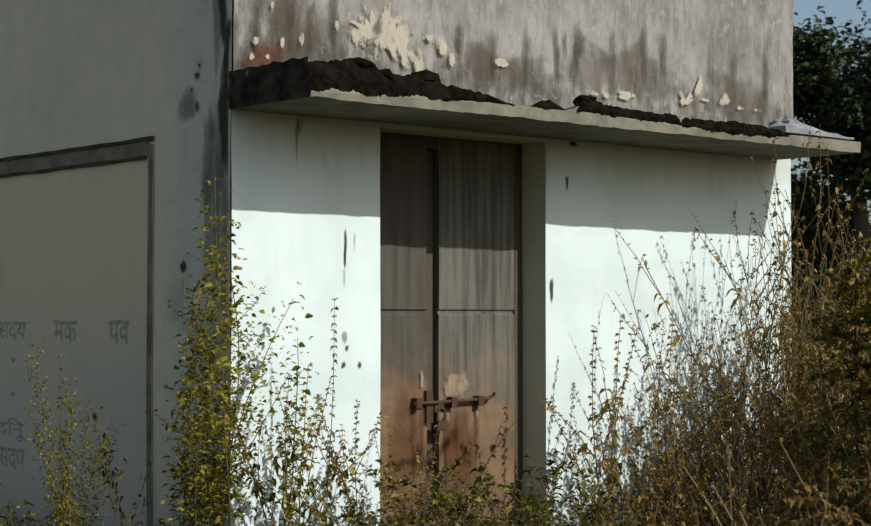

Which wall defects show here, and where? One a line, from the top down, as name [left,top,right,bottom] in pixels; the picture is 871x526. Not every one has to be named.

spalling [228,3,515,109]
water stain [206,0,231,190]
spalling [532,91,790,138]
peeling [680,75,709,106]
water stain [757,66,768,114]